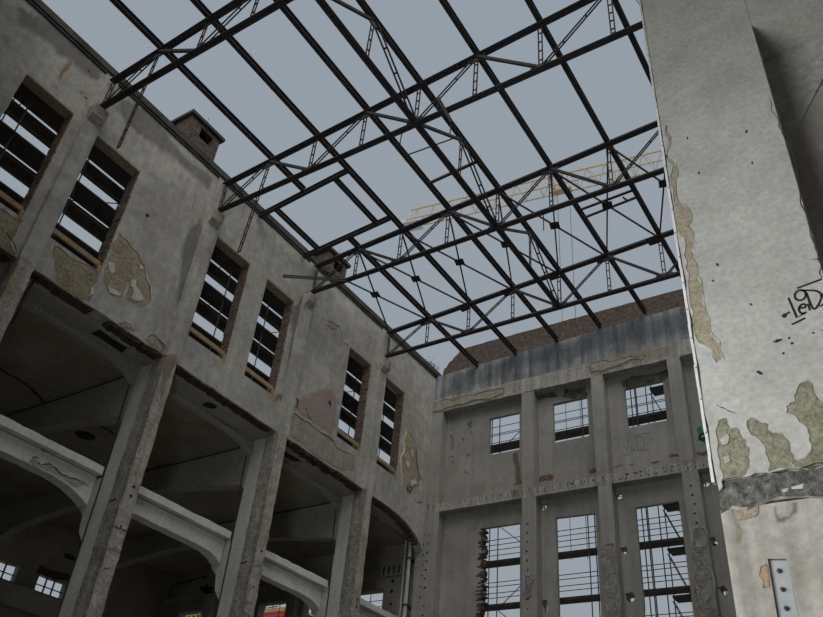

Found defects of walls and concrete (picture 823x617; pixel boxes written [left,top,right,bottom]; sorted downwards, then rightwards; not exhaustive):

flaking render [30,231,153,315]
spalling [665,126,725,369]
leakage [461,313,693,383]
spalling [286,440,361,491]
flaking render [400,428,441,508]
spalling [696,381,823,521]